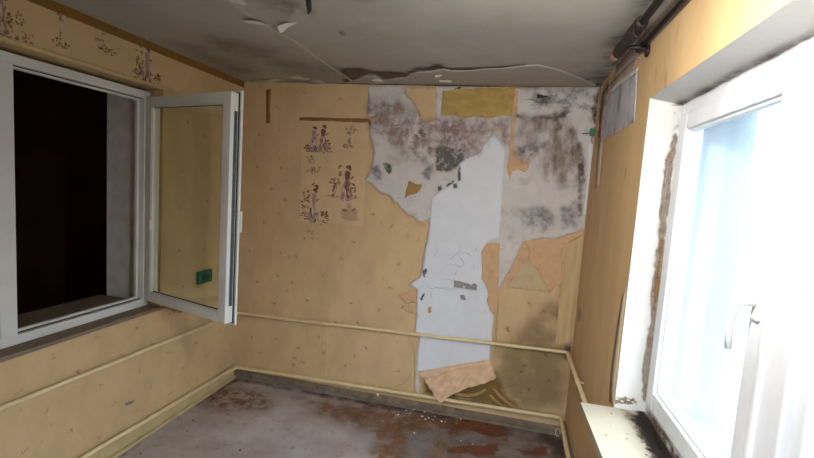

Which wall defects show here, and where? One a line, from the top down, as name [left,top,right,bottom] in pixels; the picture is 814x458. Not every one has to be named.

leakage [374,102,506,191]
flaking render [345,64,599,331]
leakage [517,95,585,223]
leakage [642,134,677,401]
leakage [625,411,672,458]